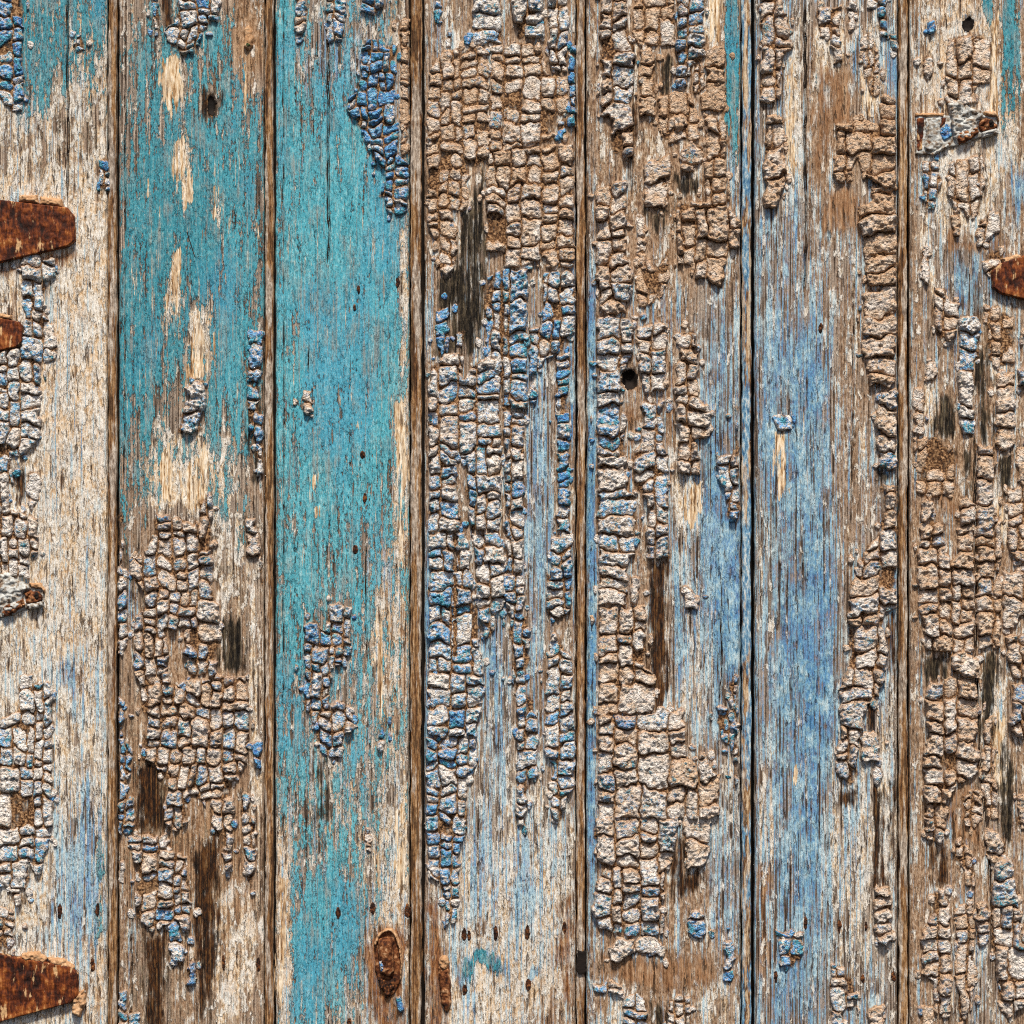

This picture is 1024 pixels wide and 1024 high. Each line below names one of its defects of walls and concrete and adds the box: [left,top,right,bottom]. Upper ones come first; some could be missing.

peeling [346,18,410,222]
peeling [755,0,794,209]
peeling [816,0,899,471]
corrosion [916,118,924,151]
peeling [0,254,59,579]
peeling [0,674,59,956]
peeling [117,377,264,986]
peeling [294,594,358,764]
peeling [424,0,741,968]
peeling [834,484,898,785]
peeling [912,246,1024,1024]
corrosion [365,928,405,1024]